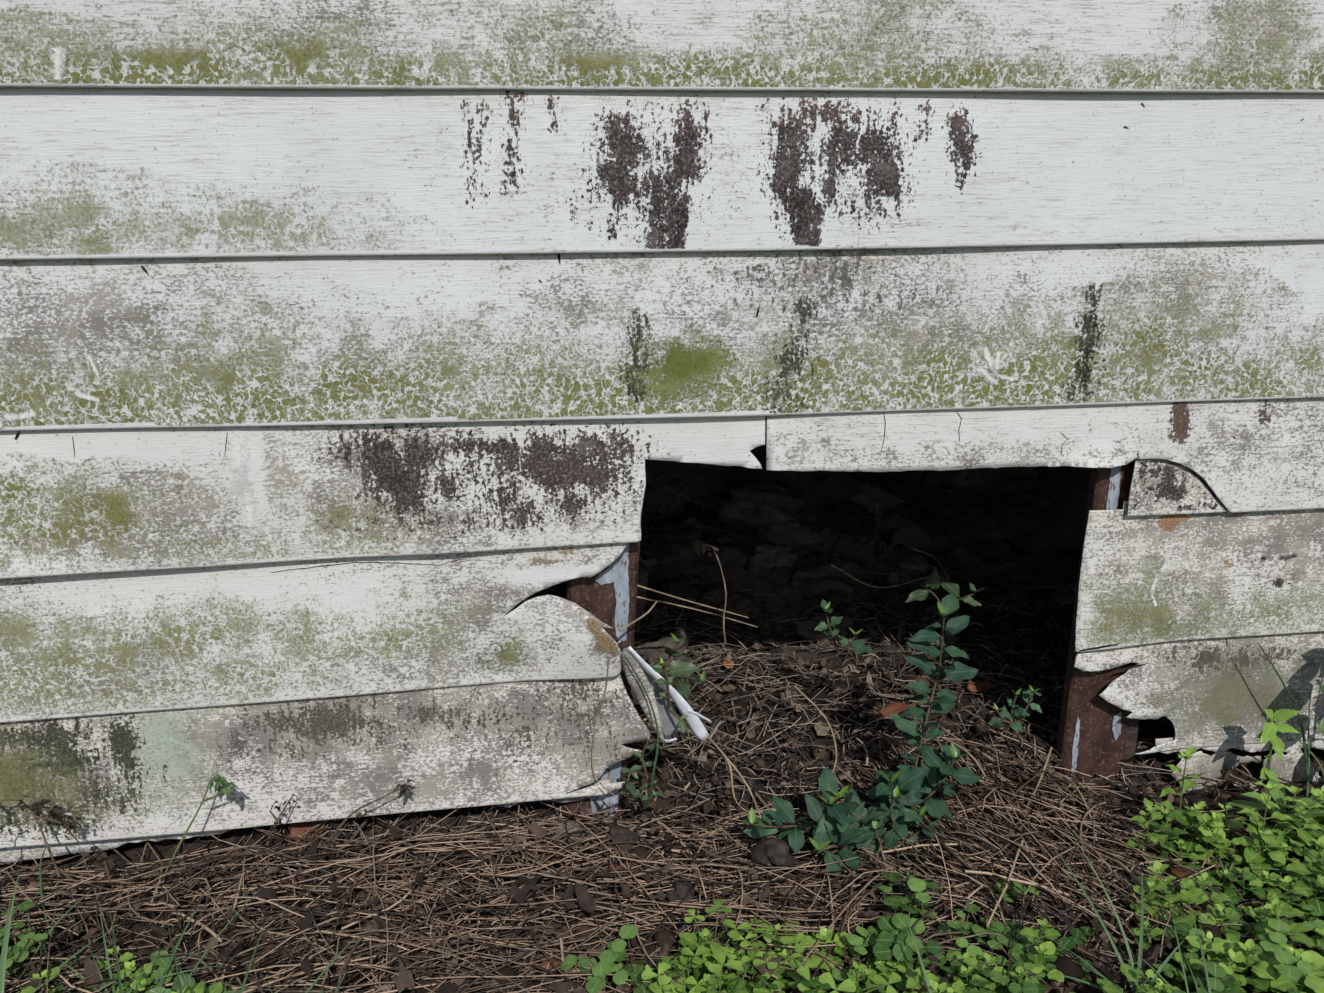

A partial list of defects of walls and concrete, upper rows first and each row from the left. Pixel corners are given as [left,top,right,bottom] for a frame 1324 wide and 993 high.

leakage [459,90,528,208]
leakage [566,91,717,248]
leakage [755,93,982,254]
leakage [1058,283,1111,402]
leakage [313,419,670,566]
peeling [1106,466,1121,510]
crack [1138,451,1229,511]
peeling [594,543,712,742]
leakage [0,712,183,843]
peeling [590,761,622,817]
peeling [1071,718,1080,771]
peeling [1112,712,1121,740]